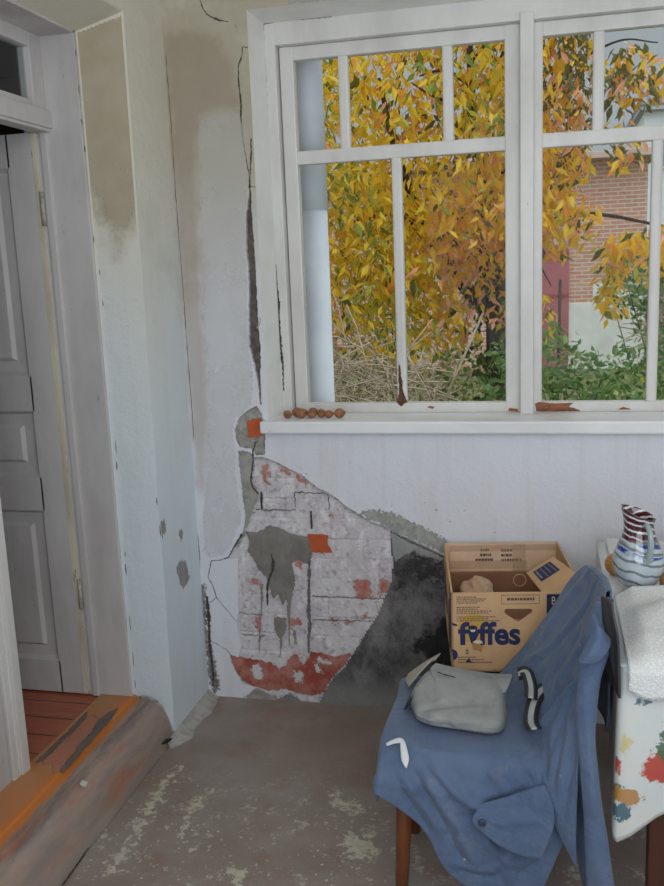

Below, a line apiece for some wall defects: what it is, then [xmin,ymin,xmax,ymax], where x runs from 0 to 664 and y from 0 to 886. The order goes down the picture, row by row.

crack [200,0,262,404]
crack [208,534,243,621]
spalling [230,406,443,702]
leakage [394,551,445,591]
leakage [413,616,452,667]
peeling [36,712,87,763]
peeling [60,708,118,773]